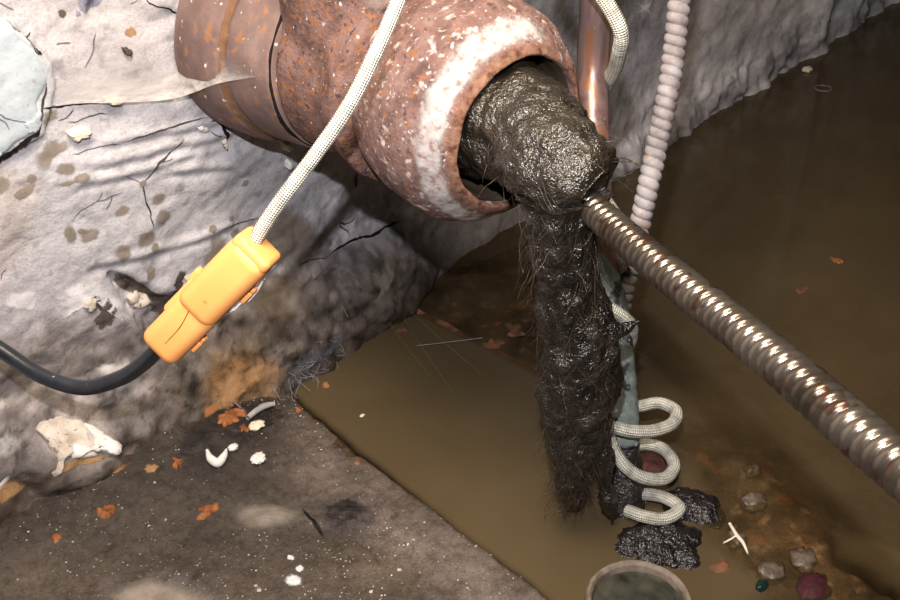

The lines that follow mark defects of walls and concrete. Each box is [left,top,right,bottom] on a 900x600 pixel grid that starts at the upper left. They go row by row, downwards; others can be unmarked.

crack [130,0,176,14]
peeling [0,27,47,162]
crack [43,103,105,124]
water stain [0,175,36,200]
water stain [38,142,89,186]
crack [72,118,230,226]
water stain [65,227,98,242]
water stain [139,194,170,253]
water stain [205,216,239,265]
crack [298,215,401,267]
flaking render [83,296,117,329]
flaking render [114,271,190,314]